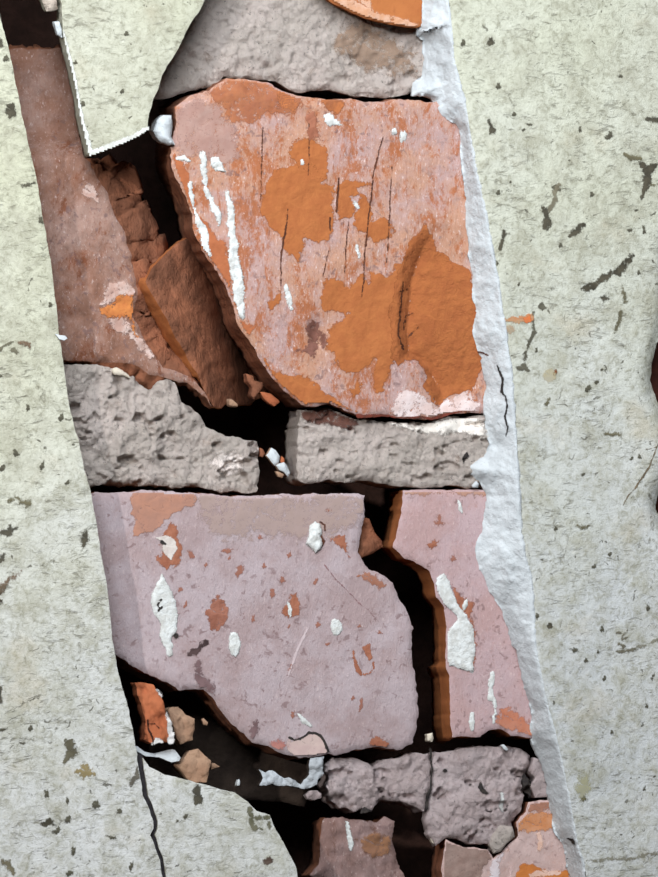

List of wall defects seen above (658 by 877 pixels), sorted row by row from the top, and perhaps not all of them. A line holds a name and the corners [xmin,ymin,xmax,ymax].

spalling [63,30,149,156]
peeling [205,80,396,263]
peeling [173,153,256,335]
peeling [99,295,138,338]
peeling [243,374,279,407]
peeling [264,358,357,412]
peeling [258,448,290,478]
flaking render [297,0,586,877]
peeling [130,493,197,570]
spalling [205,595,229,631]
peeling [271,734,327,755]
crack [129,754,165,877]